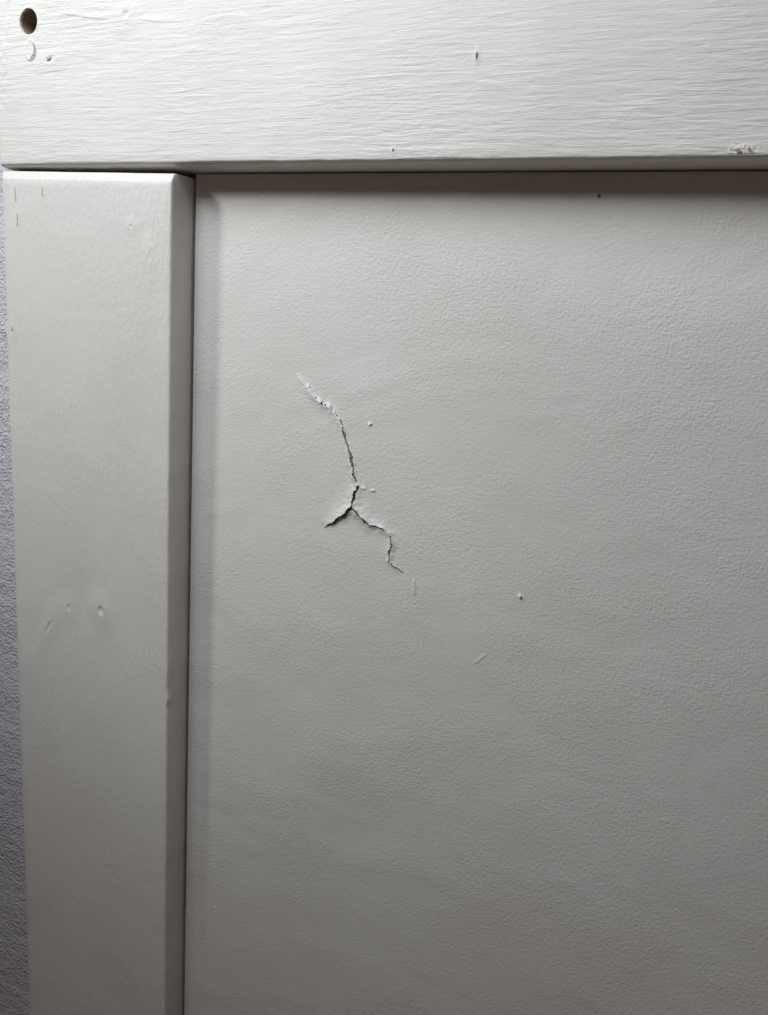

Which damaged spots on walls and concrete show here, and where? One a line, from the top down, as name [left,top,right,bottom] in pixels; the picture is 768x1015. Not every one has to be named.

crack [294,371,417,596]